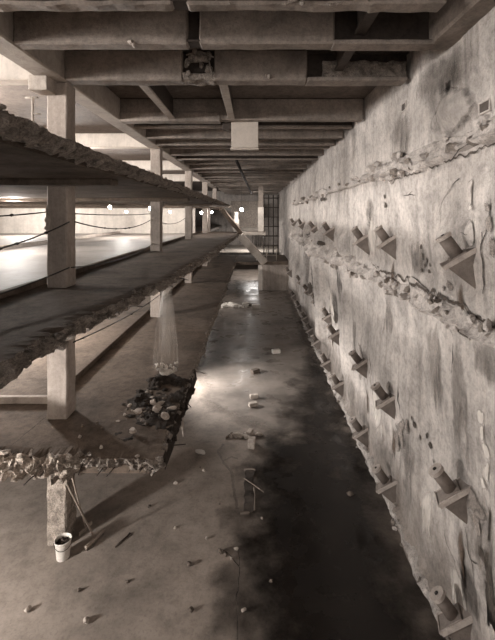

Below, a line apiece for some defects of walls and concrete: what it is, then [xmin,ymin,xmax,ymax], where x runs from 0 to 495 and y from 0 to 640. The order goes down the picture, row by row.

spalling [184,48,214,77]
peeling [445,134,479,153]
peeling [293,151,429,206]
crack [480,201,491,290]
crack [371,262,495,328]
spalling [0,232,239,486]
leakage [228,359,446,640]